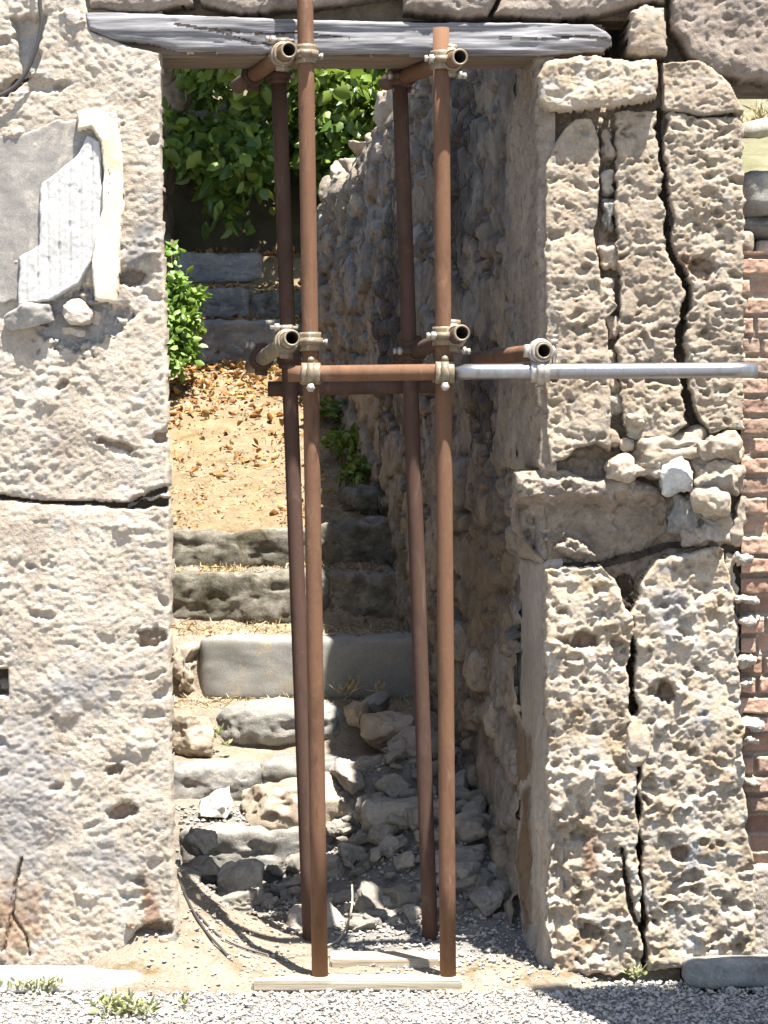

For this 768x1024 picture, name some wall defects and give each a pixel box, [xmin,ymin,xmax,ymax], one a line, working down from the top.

peeling [0,108,146,352]
crack [654,107,699,426]
crack [0,487,169,509]
crack [563,542,708,716]
crack [4,858,31,953]
crack [621,774,644,949]